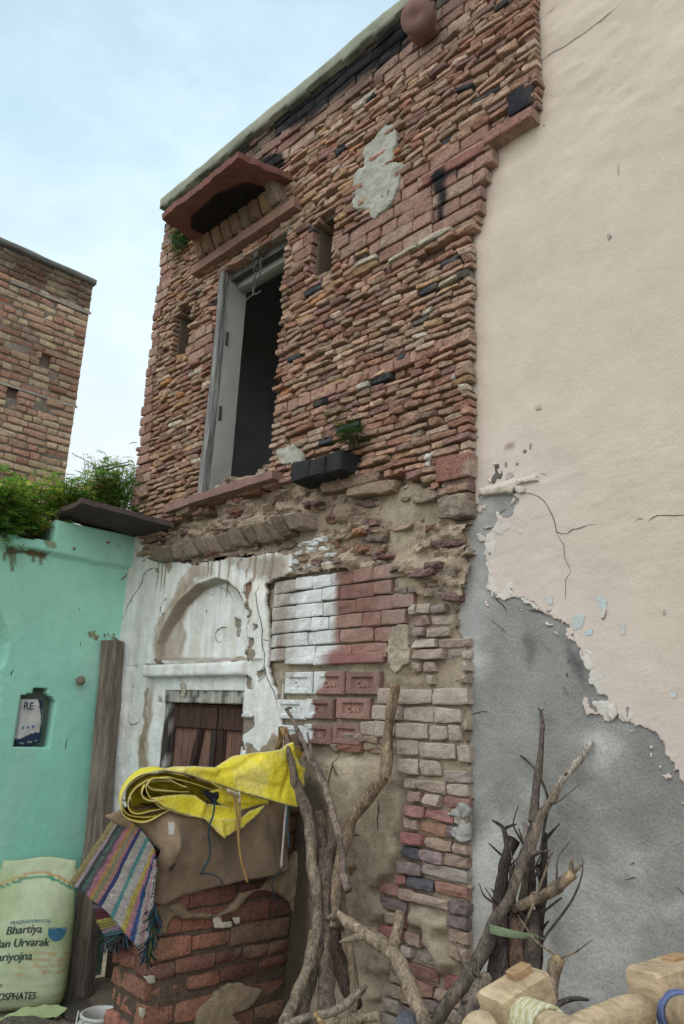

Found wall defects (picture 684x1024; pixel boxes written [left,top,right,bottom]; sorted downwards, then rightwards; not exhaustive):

crack [544,5,618,59]
crack [484,473,594,597]
peeling [146,443,684,1024]